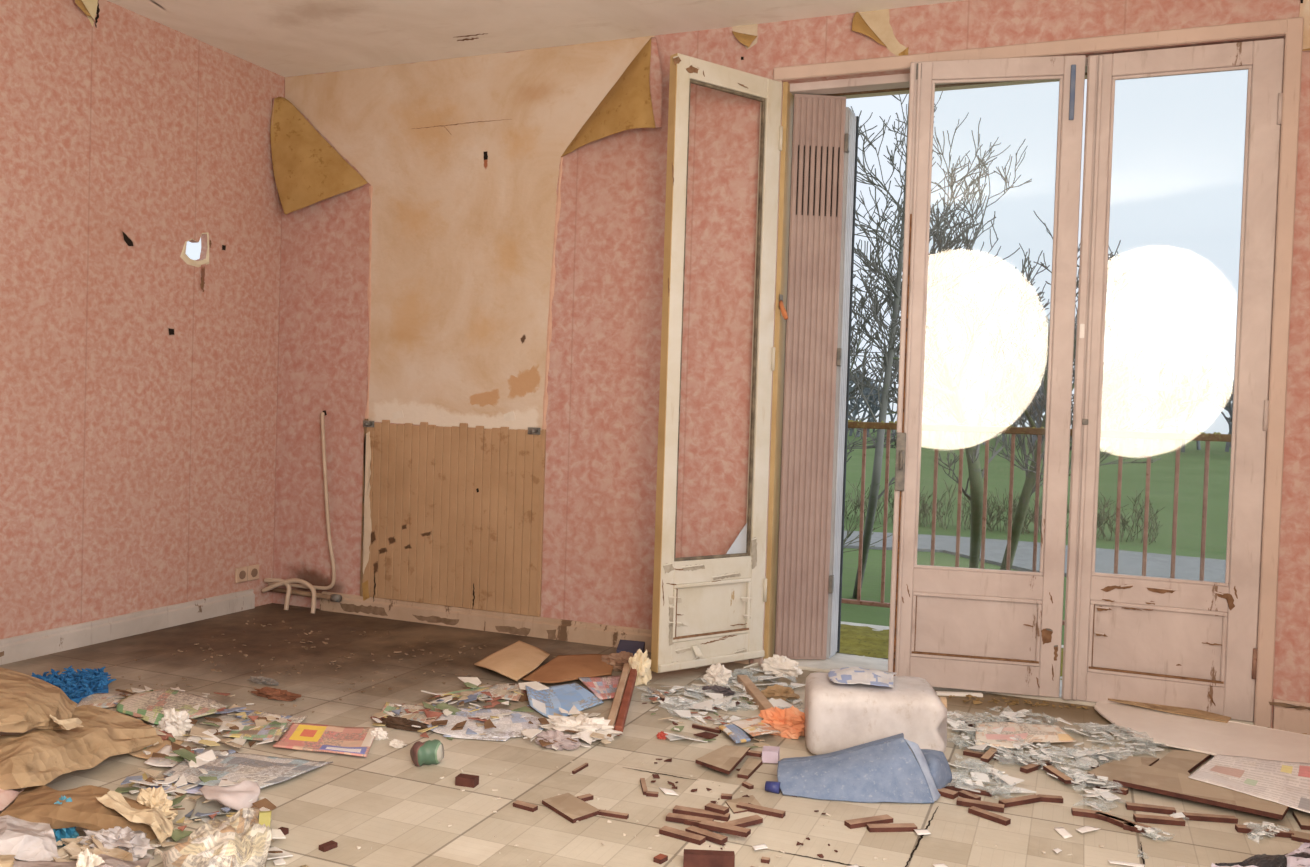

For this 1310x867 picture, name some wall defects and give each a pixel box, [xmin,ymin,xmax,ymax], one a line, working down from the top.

flaking render [82,0,98,27]
flaking render [859,9,909,56]
spalling [180,233,227,293]
flaking render [285,35,655,616]
crack [779,851,861,867]
crack [905,806,939,867]